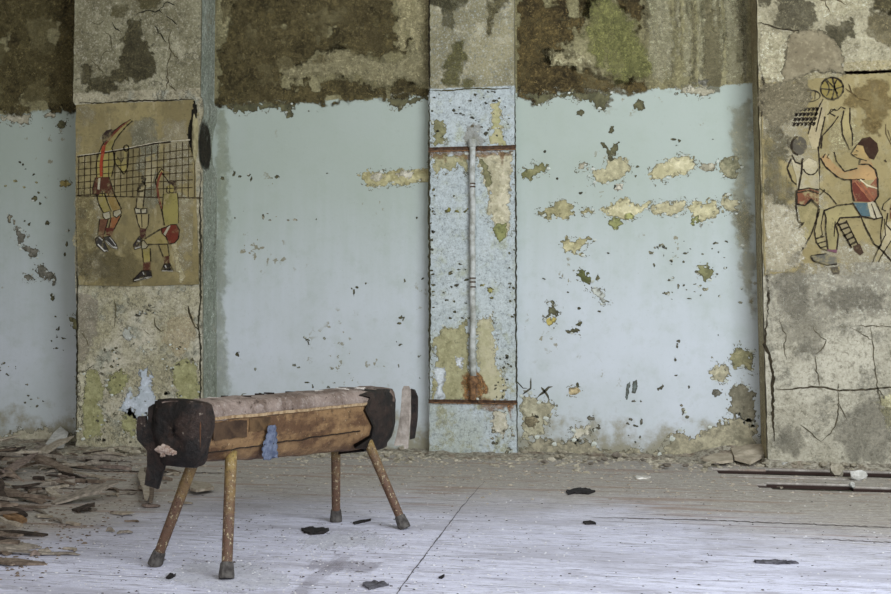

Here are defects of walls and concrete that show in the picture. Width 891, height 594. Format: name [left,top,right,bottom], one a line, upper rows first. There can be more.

crack [79,2,192,104]
leakage [441,41,474,88]
peeling [515,87,618,116]
peeling [7,213,56,301]
leakage [162,0,468,398]
peeling [356,91,558,243]
peeling [534,126,744,230]
leakage [486,0,891,459]
peeling [68,325,202,443]
corrosion [461,371,513,411]
peeling [419,263,761,456]
crack [762,275,891,442]